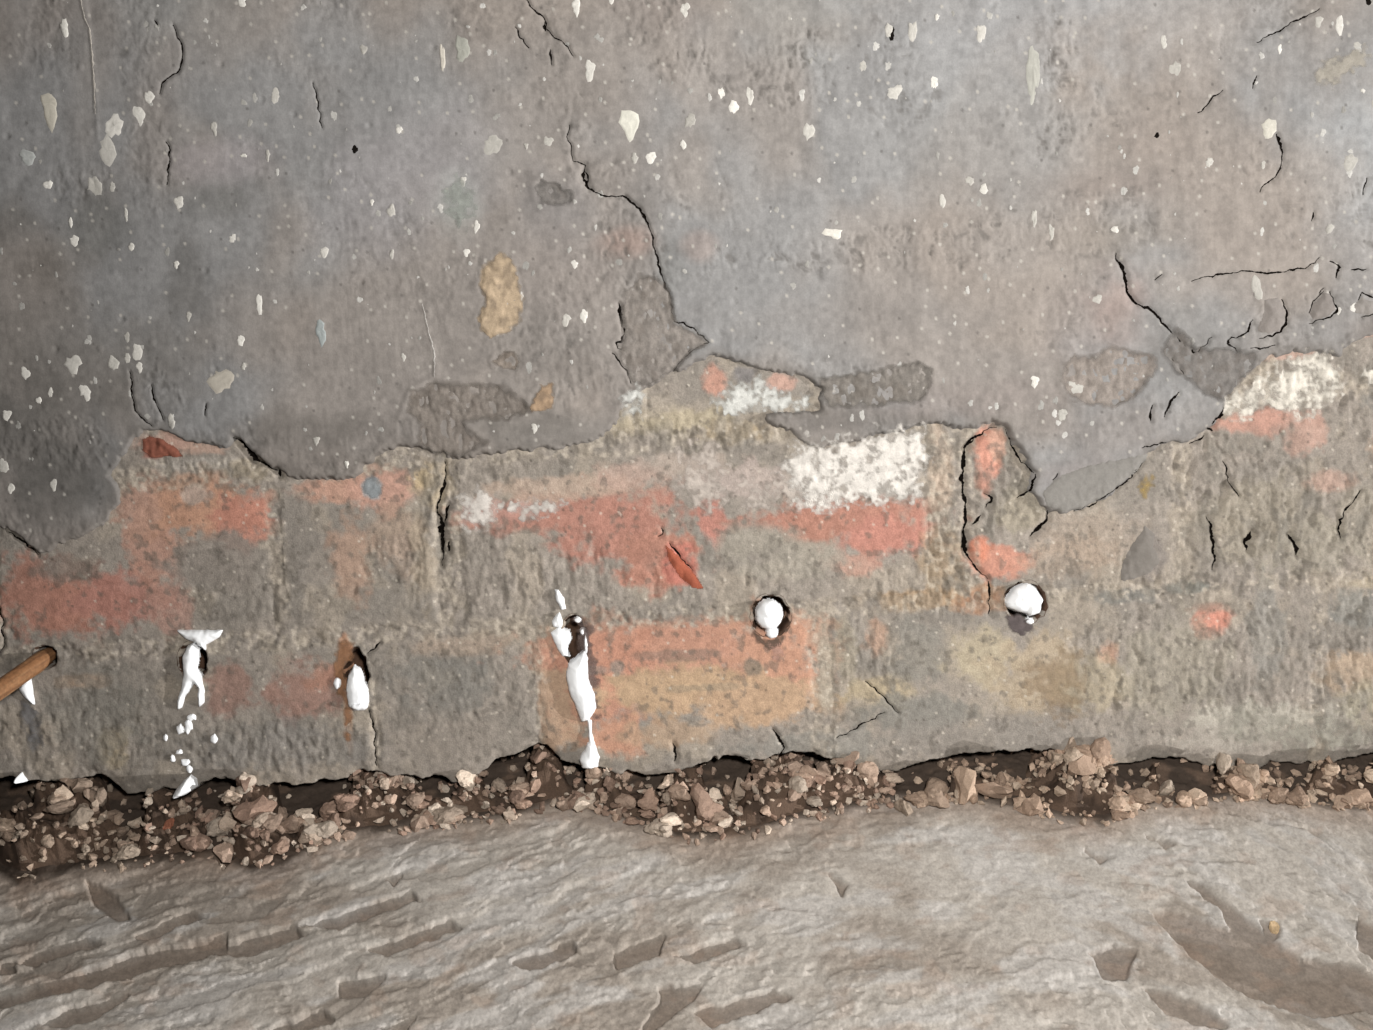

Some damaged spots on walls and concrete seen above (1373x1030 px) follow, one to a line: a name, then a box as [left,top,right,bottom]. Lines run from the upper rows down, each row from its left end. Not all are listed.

crack [515,0,573,65]
spalling [477,253,523,338]
crack [567,125,710,383]
spalling [0,275,1373,794]
efflorescence [673,422,929,514]
crack [959,253,1373,614]